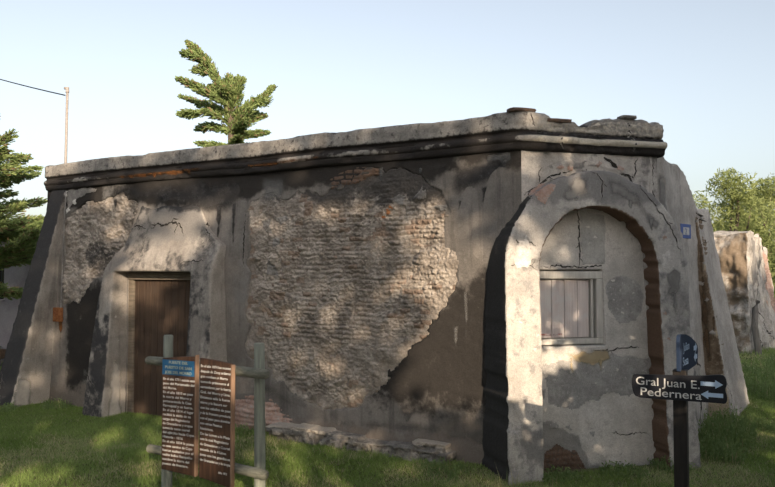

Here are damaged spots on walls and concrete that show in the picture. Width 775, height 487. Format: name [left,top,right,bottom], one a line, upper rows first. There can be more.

crack [524,123,681,254]
spalling [62,187,138,304]
crack [132,218,184,253]
peeling [513,235,541,276]
spalling [245,167,459,410]
damp [571,351,609,370]
peeling [109,363,121,416]
spalling [265,399,292,431]
spalling [544,444,586,473]